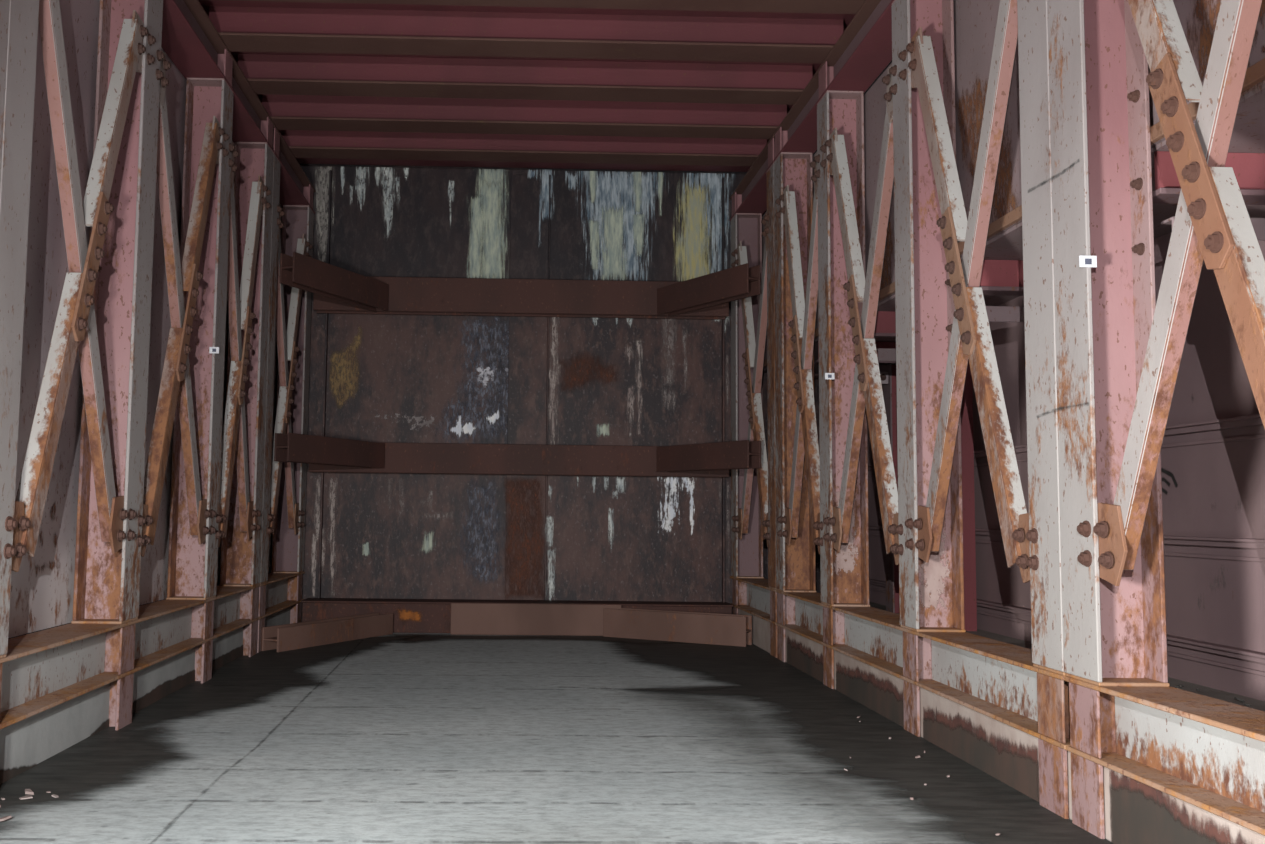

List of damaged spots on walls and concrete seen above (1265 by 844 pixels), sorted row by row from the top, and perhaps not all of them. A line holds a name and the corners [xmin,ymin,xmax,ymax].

rust [1187,0,1221,81]
damp [315,166,409,262]
damp [467,169,507,279]
damp [529,169,734,282]
damp [593,477,624,541]
damp [657,477,695,535]
damp [547,516,555,601]